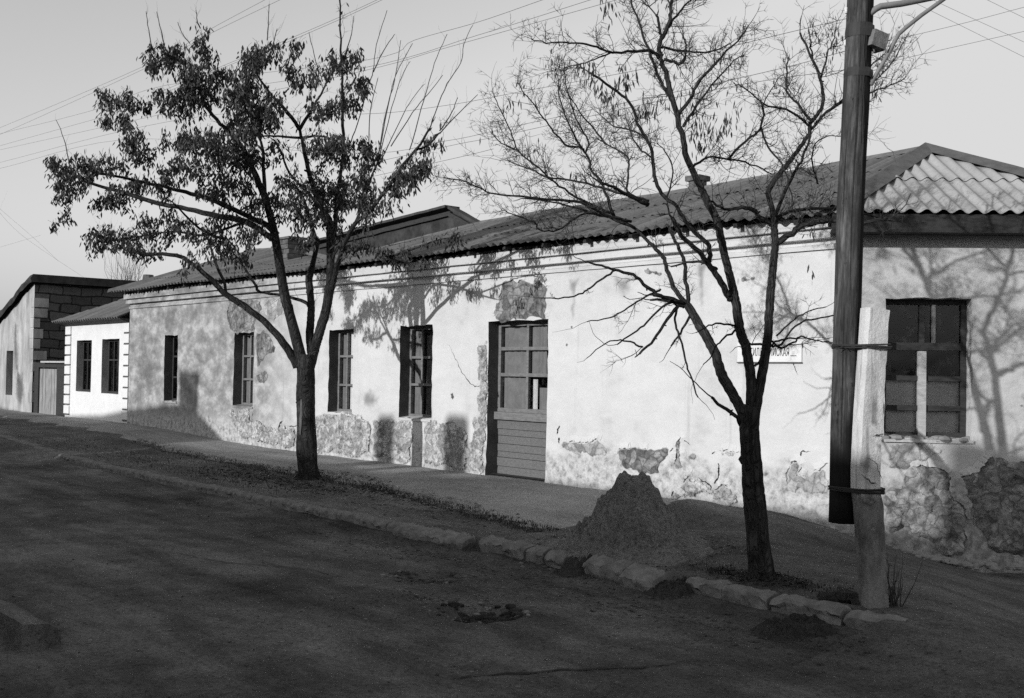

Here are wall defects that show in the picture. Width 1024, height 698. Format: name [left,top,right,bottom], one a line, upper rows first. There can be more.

peeling [491,275,552,323]
spalling [229,408,295,448]
spalling [315,341,488,475]
spalling [562,431,736,506]
spalling [781,454,830,495]
spalling [876,442,1024,557]